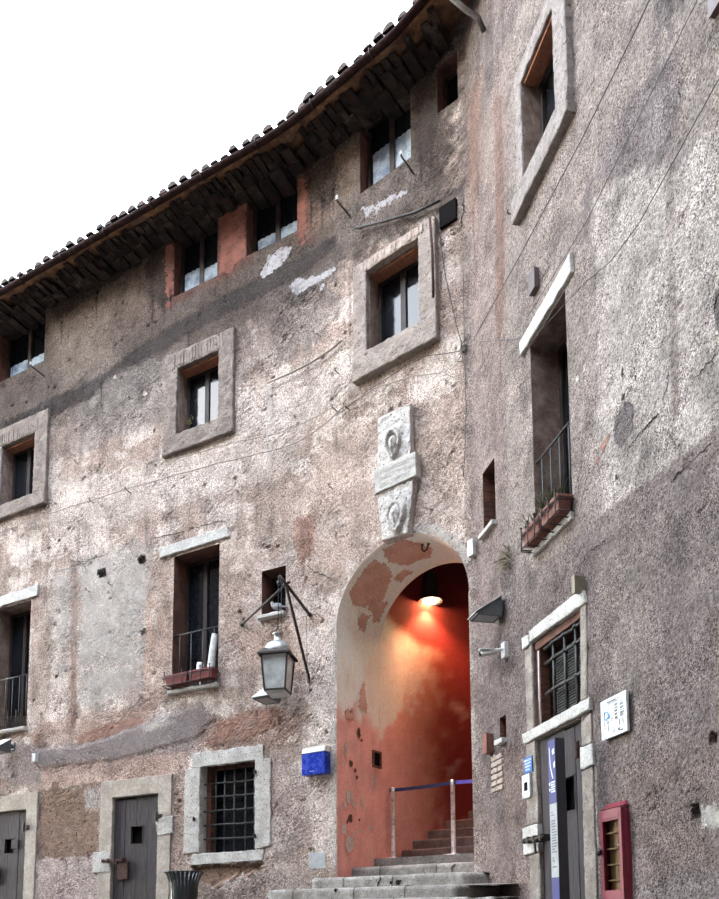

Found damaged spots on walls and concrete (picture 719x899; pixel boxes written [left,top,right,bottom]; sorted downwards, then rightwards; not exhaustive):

peeling [260,175,308,278]
spalling [360,189,407,219]
peeling [349,522,471,633]
spalling [331,638,375,867]